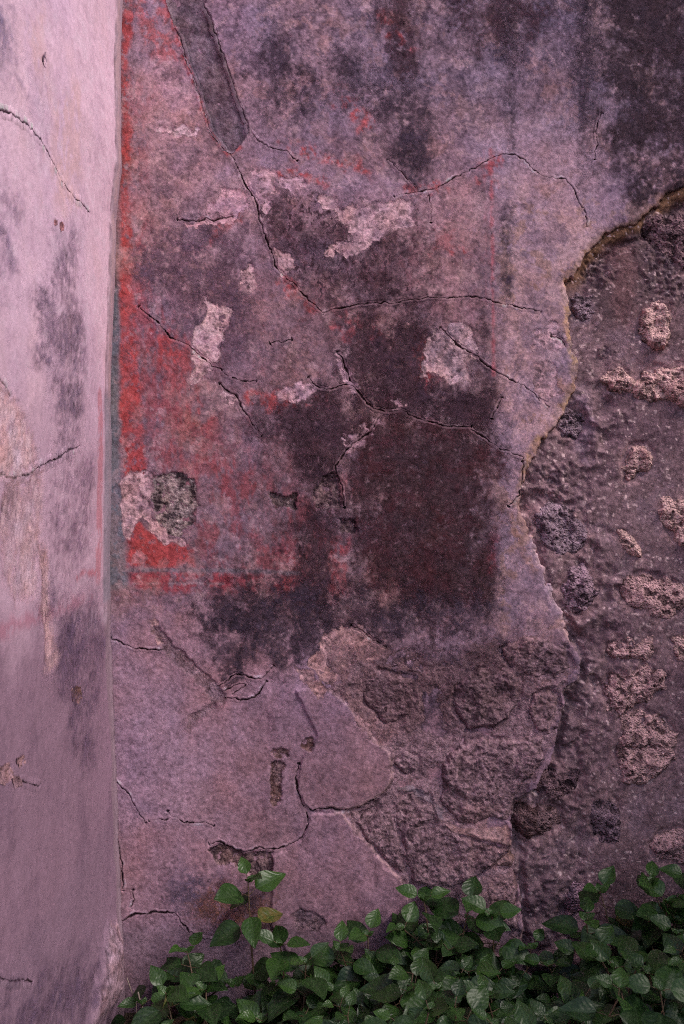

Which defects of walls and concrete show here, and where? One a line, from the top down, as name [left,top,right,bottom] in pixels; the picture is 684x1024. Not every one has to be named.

water stain [450,0,550,59]
crack [0,103,90,217]
water stain [36,236,84,368]
water stain [135,225,253,346]
peeling [190,296,236,405]
peeling [318,194,416,258]
crack [178,128,590,347]
water stain [192,192,507,685]
crack [306,326,551,508]
spalling [119,470,198,546]
crack [116,764,397,943]
spalling [297,625,578,957]